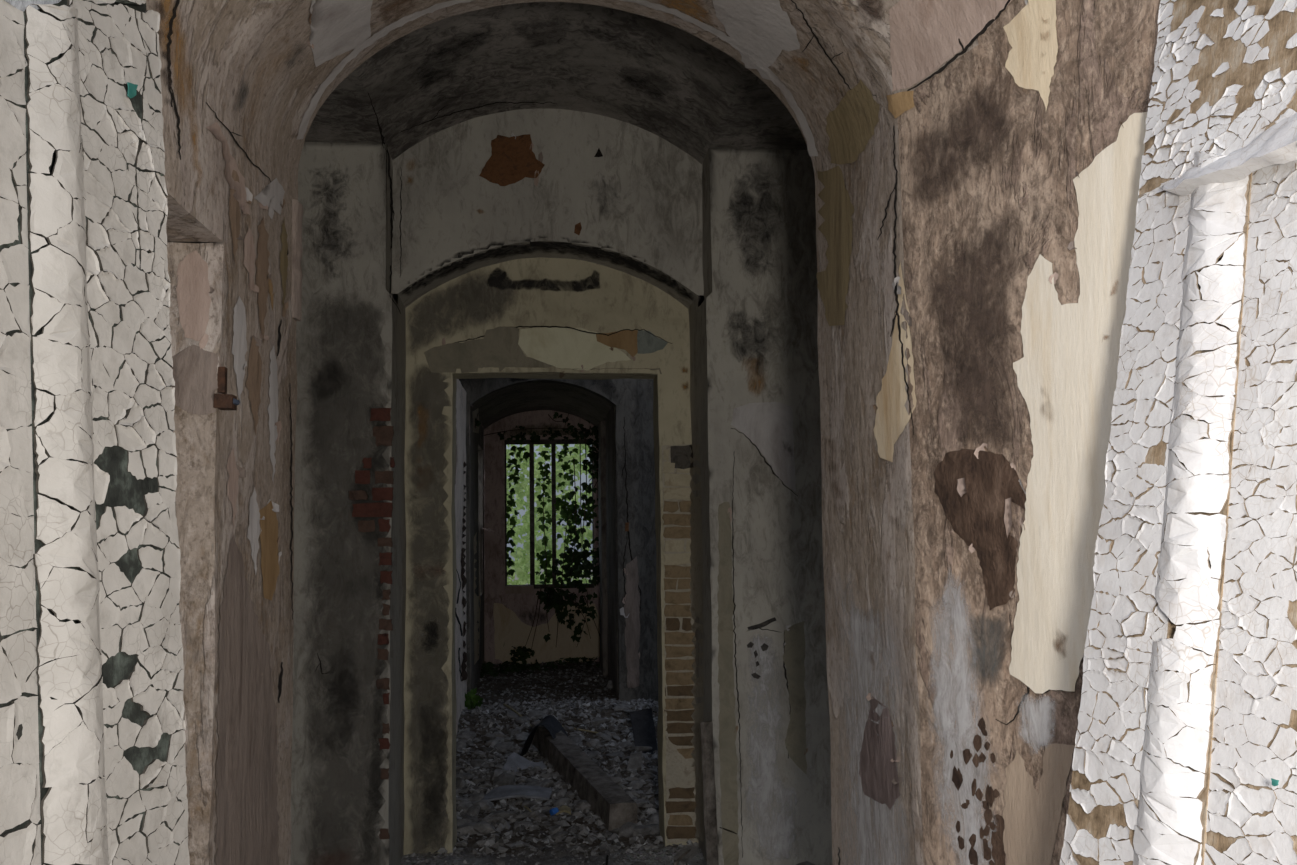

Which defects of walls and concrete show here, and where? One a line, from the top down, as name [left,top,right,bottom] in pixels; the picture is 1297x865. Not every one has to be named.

flaking render [1003,0,1058,110]
flaking render [479,132,545,186]
leakage [914,87,1009,200]
flaking render [424,326,668,378]
flaking render [873,262,917,462]
leakage [933,219,1011,443]
flaking render [934,112,1147,694]
flaking render [620,556,640,688]
flaking render [662,444,739,865]
flaking render [859,692,904,810]
flaking render [950,717,1074,865]
crack [995,687,1063,725]